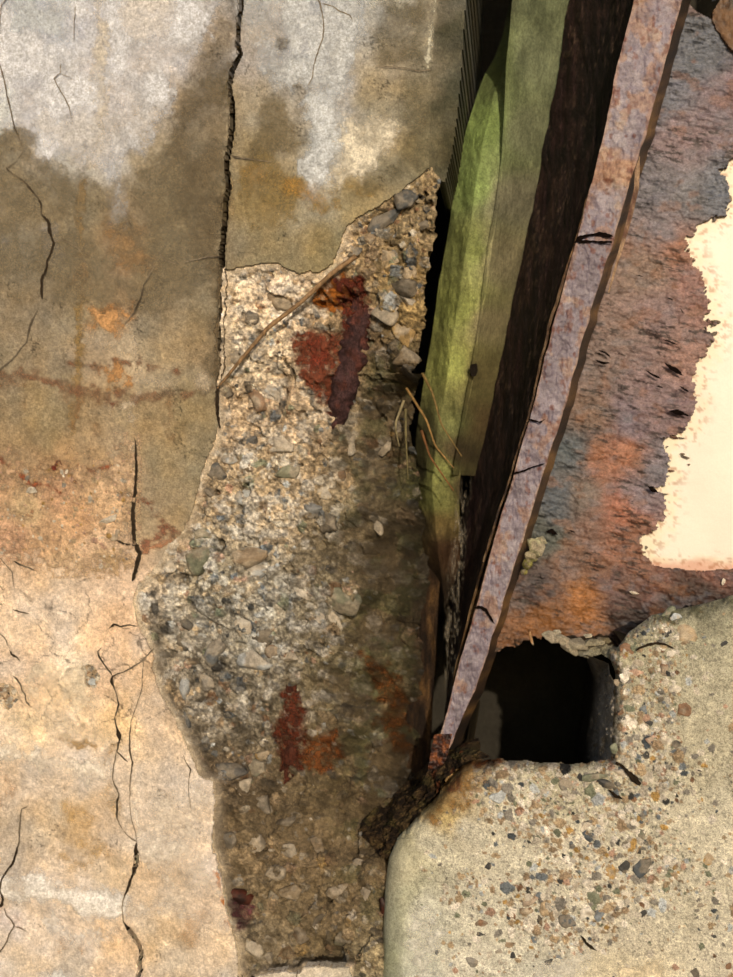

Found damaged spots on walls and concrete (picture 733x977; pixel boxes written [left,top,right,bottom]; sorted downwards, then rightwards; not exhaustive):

leakage [0,0,233,390]
crack [116,439,142,581]
crack [125,0,270,428]
spalling [0,0,484,977]
crack [308,0,352,85]
rust [290,271,371,415]
rust [482,180,593,562]
rust [608,157,640,293]
peeling [640,159,733,585]
crack [0,807,26,952]
crack [97,623,154,976]
rust [272,689,344,773]